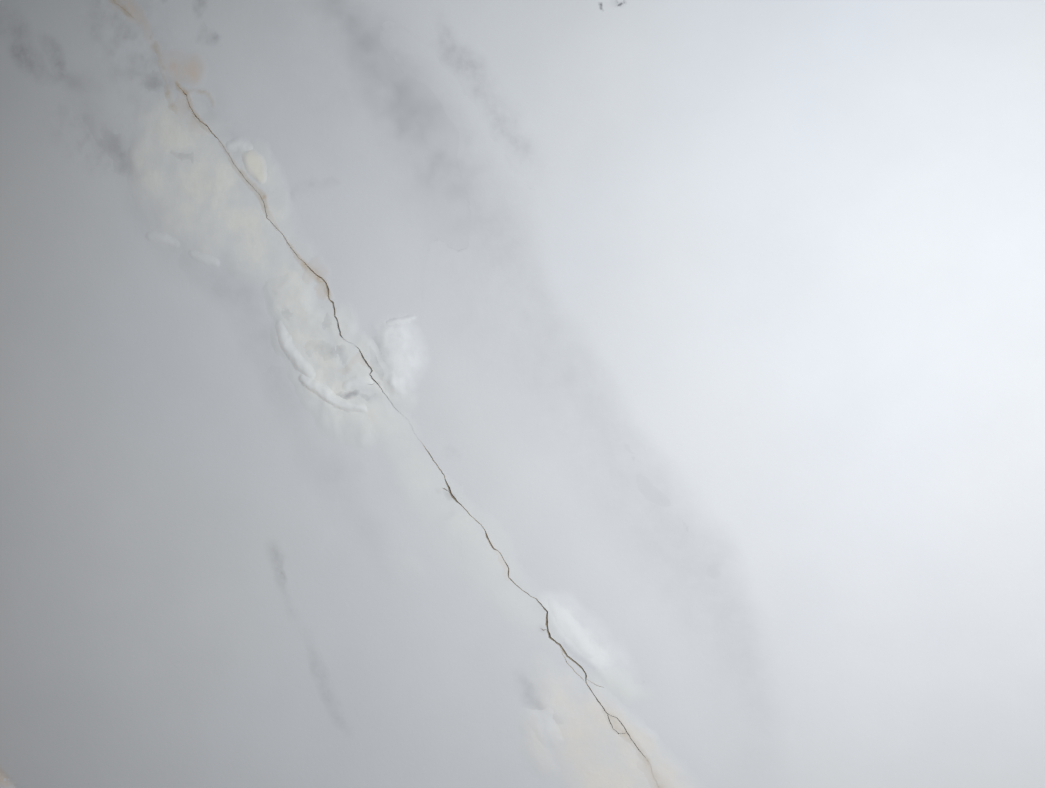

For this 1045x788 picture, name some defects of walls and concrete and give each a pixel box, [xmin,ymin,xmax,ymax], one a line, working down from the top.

crack [176,84,399,412]
damp [0,0,798,788]
crack [421,442,642,753]